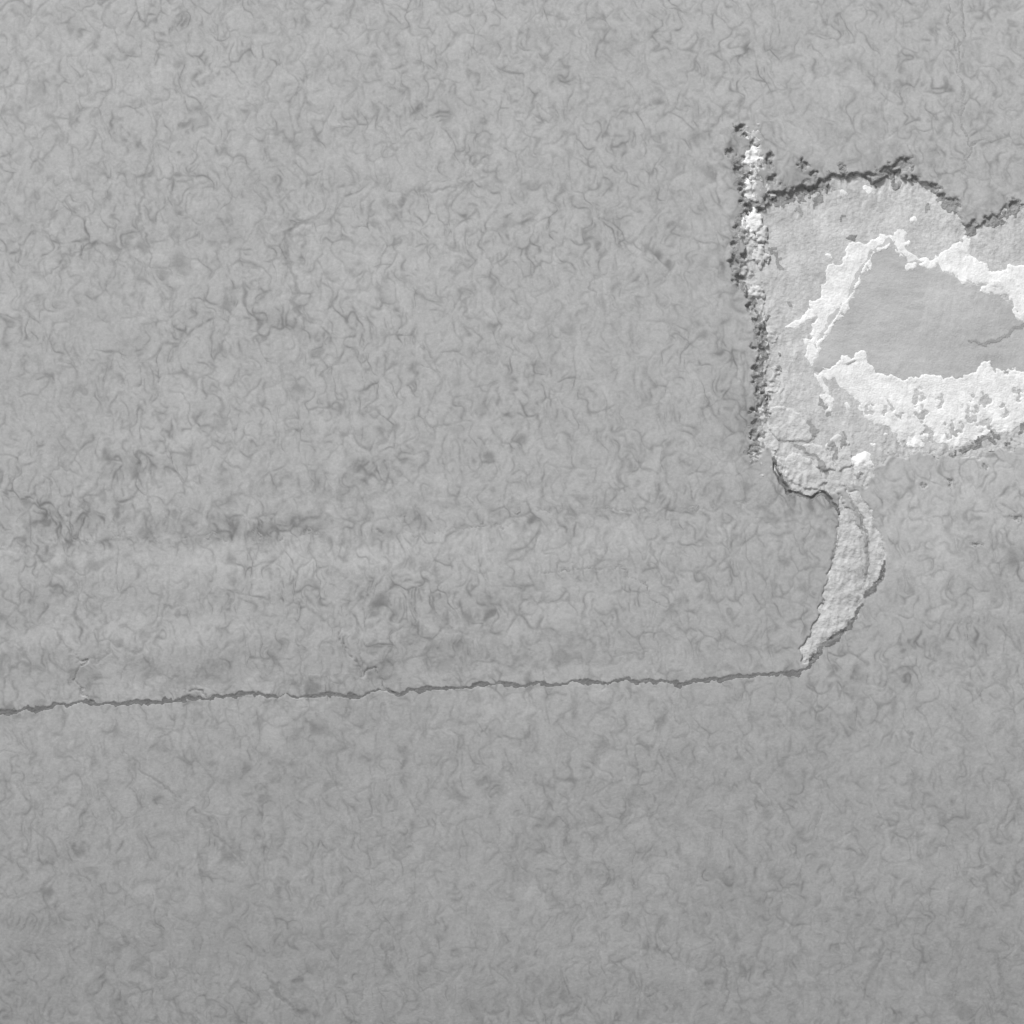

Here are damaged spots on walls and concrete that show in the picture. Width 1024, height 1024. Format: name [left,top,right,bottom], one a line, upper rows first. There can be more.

flaking render [742,154,1024,663]
crack [0,638,820,716]